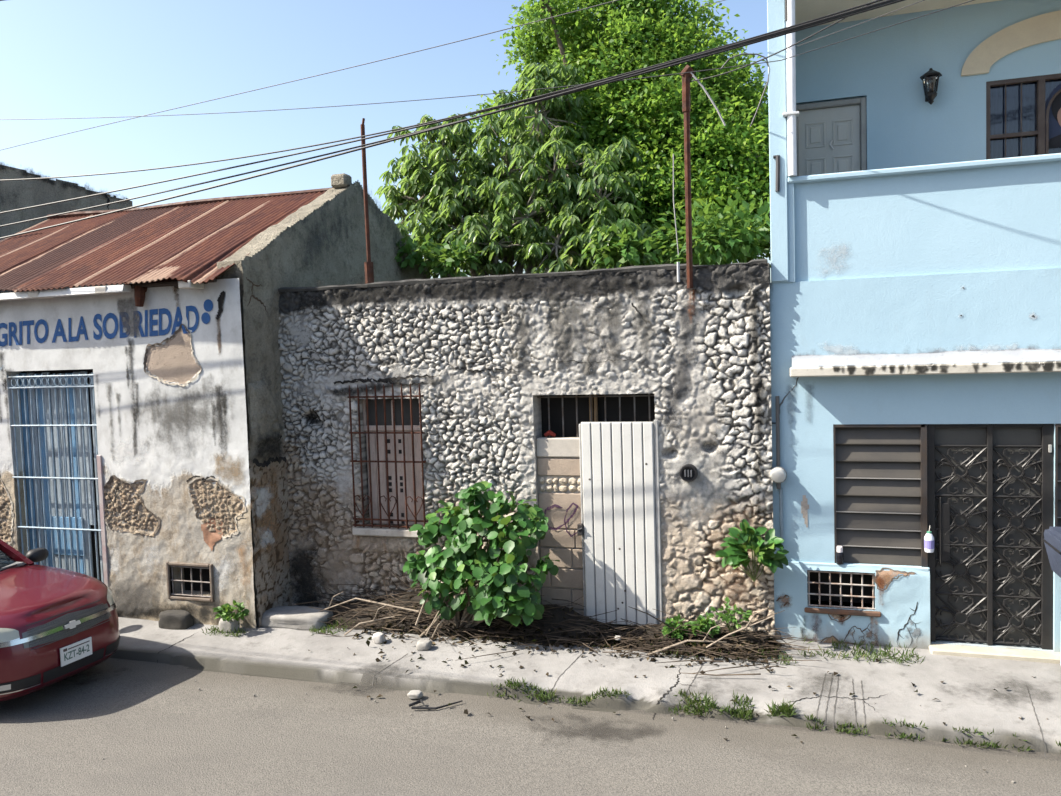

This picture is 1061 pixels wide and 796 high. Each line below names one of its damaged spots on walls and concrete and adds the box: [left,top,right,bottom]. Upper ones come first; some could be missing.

flaking render [143,324,202,386]
water stain [820,350,955,375]
water stain [1002,347,1061,372]
water stain [125,341,138,447]
water stain [151,386,241,480]
flaking render [0,478,14,545]
flaking render [104,475,160,537]
flaking render [187,477,270,551]
peeling [874,568,916,605]
crack [842,602,921,646]